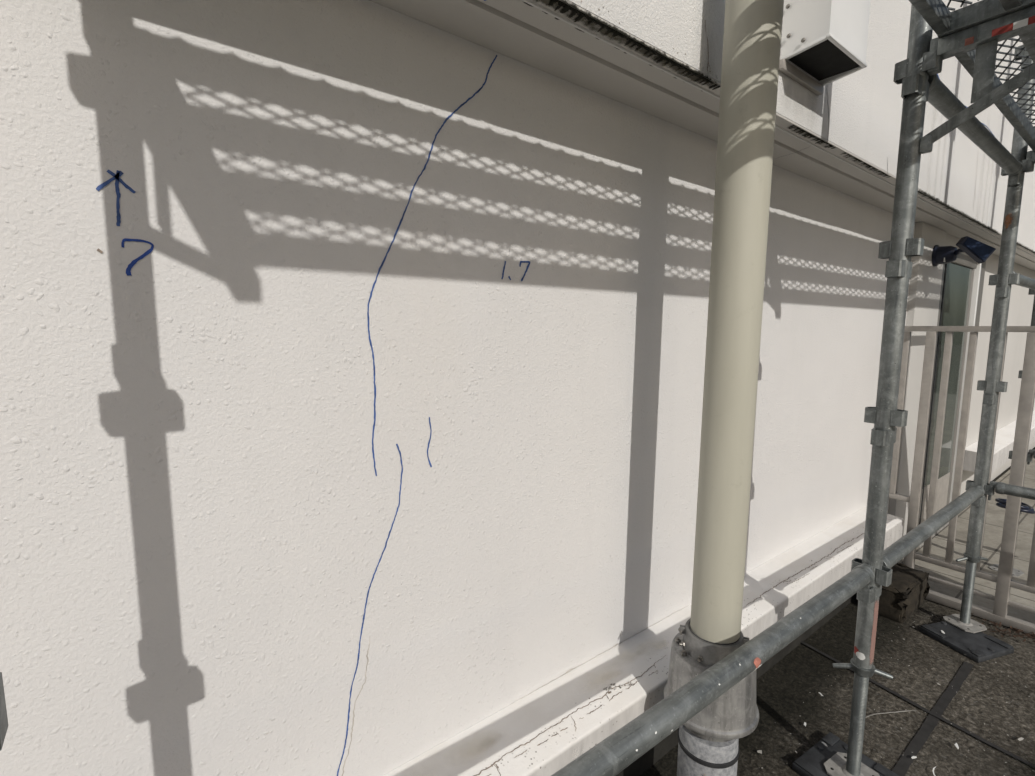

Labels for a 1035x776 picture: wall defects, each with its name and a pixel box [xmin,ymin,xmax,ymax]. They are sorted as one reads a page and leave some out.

crack [746,533,864,606]
crack [342,643,370,776]
crack [474,655,666,776]